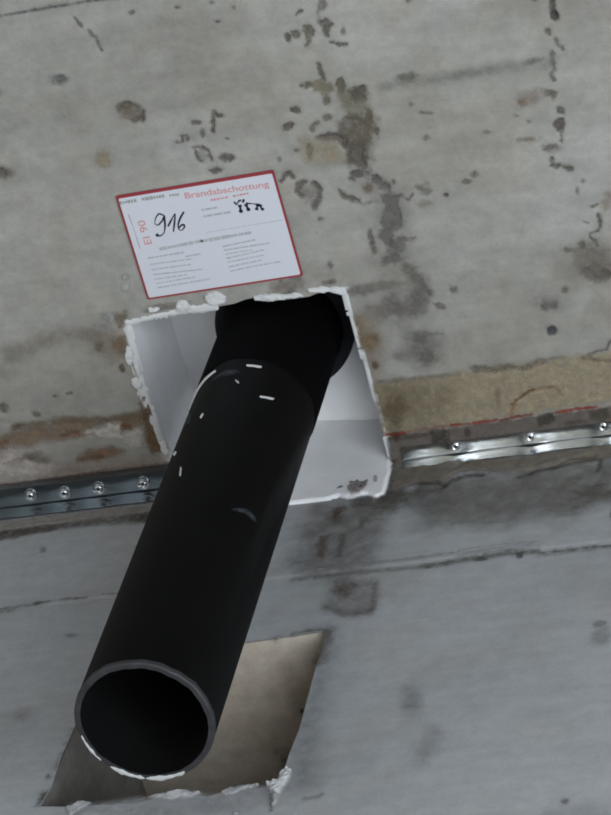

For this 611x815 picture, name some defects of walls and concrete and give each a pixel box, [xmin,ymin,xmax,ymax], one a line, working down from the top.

crack [10,0,90,15]
water stain [274,276,301,294]
corrosion [97,336,126,353]
corrosion [0,397,161,452]
corrosion [41,447,122,476]
crack [294,542,611,577]
crack [0,593,118,610]